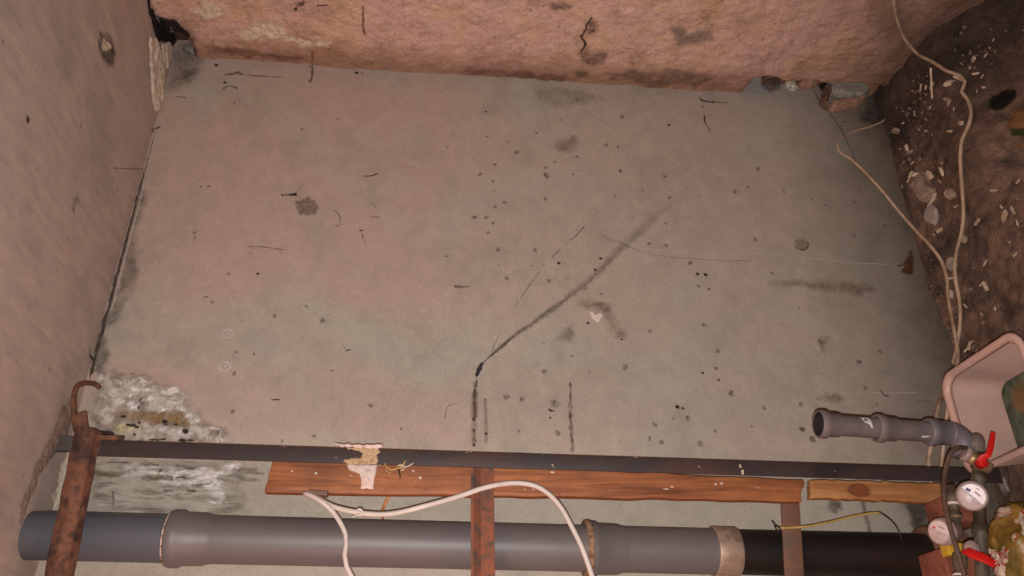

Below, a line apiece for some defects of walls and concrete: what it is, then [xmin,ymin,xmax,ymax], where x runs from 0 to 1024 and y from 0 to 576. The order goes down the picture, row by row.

spalling [148,37,173,112]
crack [552,4,607,77]
water stain [89,371,231,443]
water stain [88,459,256,516]
peeling [333,443,383,489]